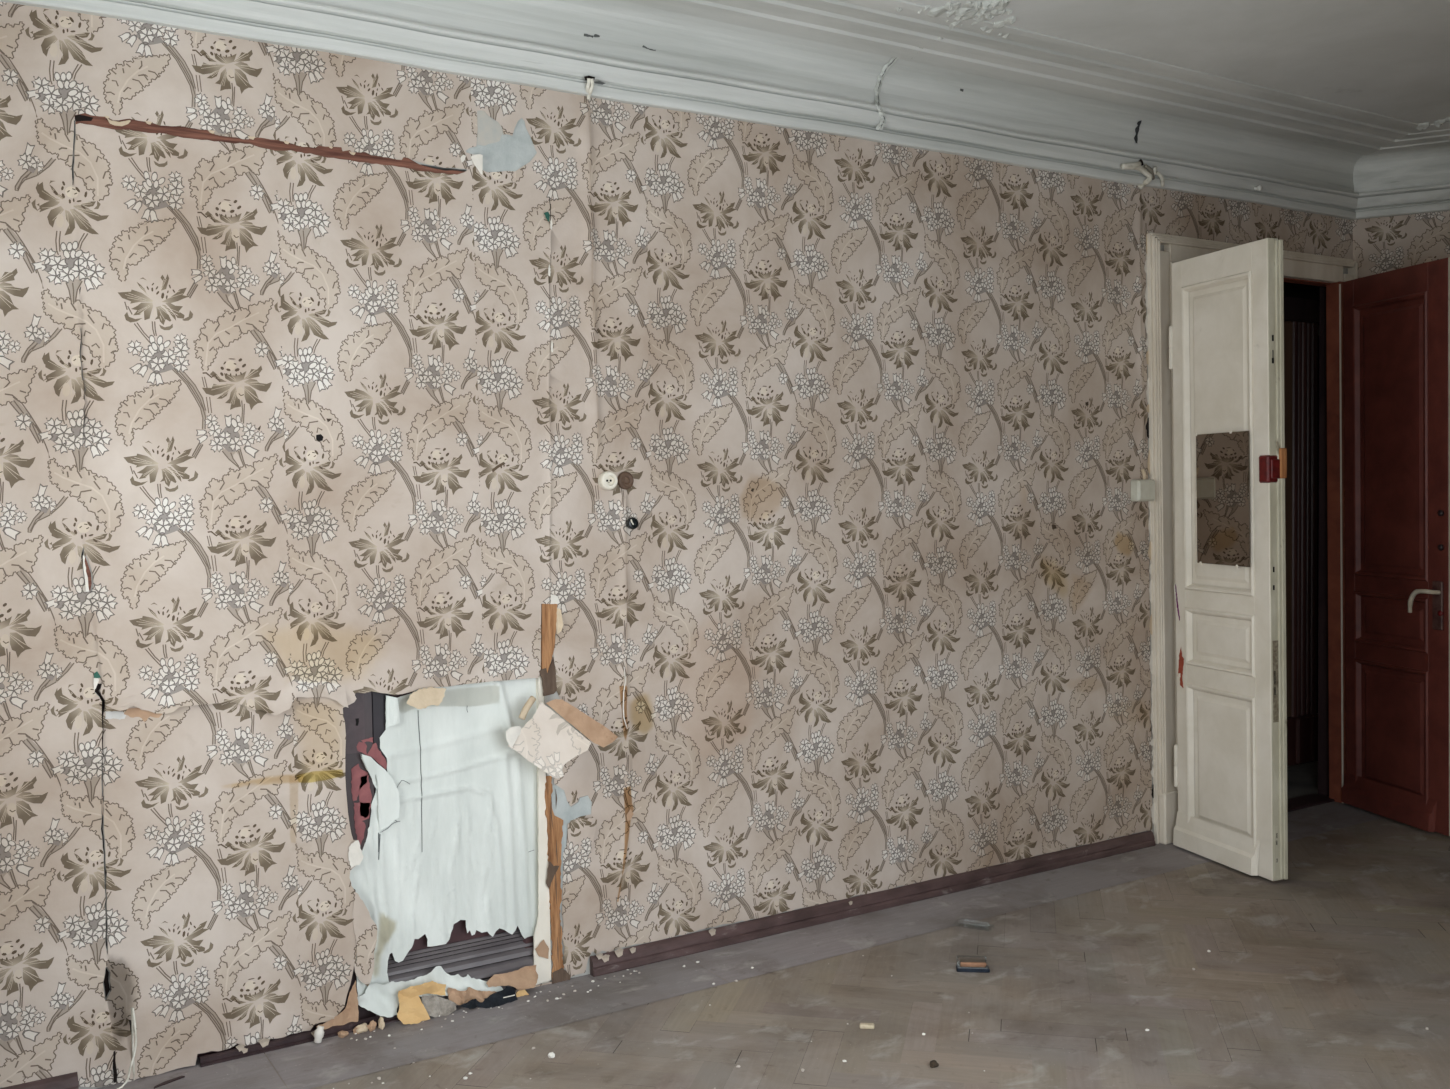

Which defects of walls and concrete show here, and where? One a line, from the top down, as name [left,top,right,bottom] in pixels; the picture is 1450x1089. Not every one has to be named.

crack [874,0,1013,130]
peeling [460,111,537,175]
crack [81,552,92,592]
crack [94,672,104,777]
peeling [551,785,592,910]
crack [101,815,110,997]
crack [110,1057,118,1082]